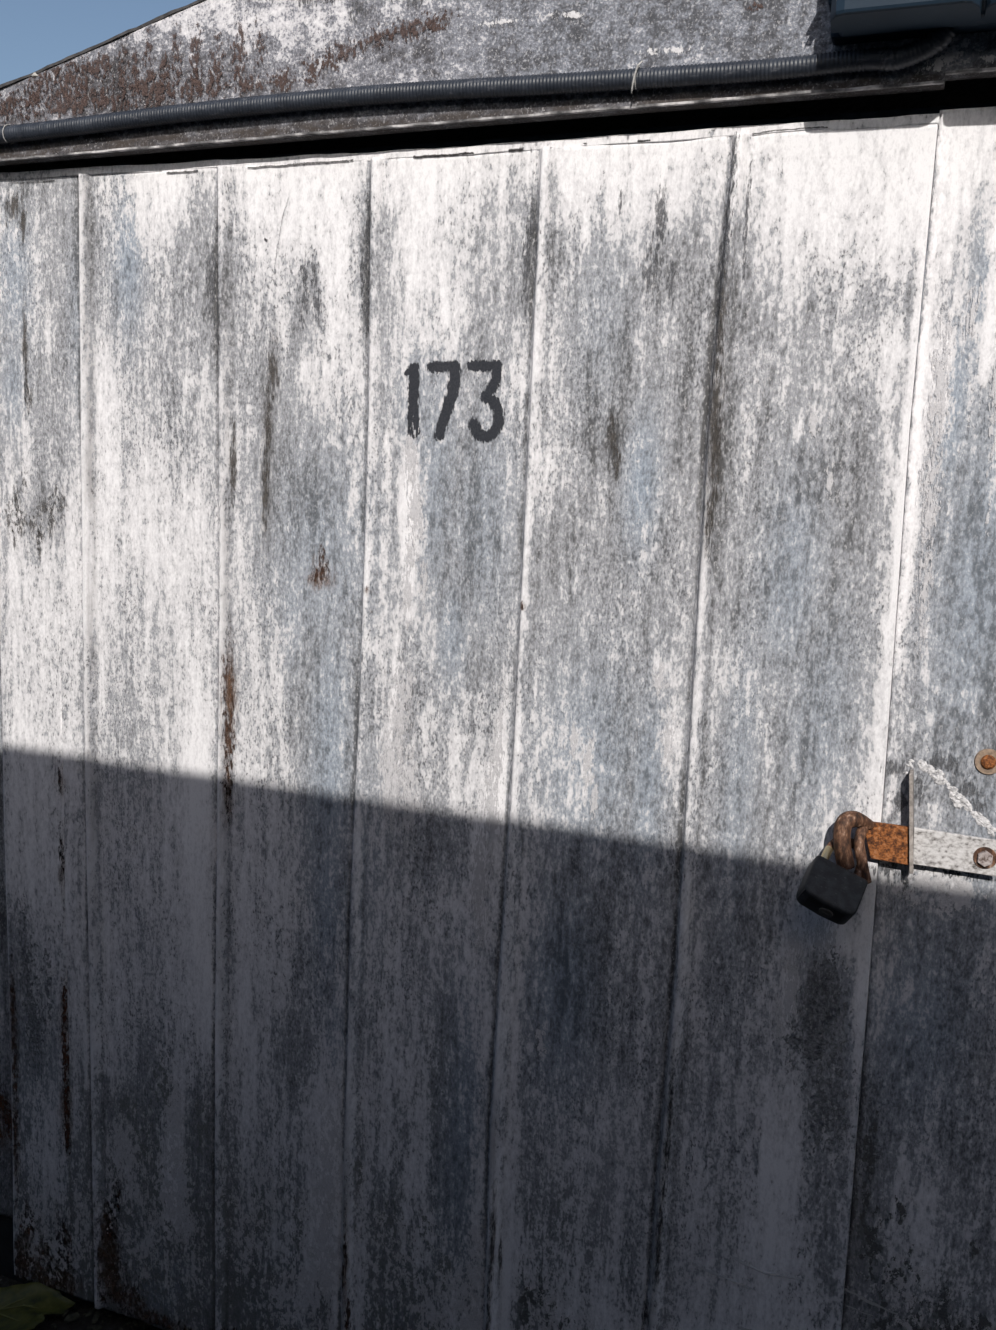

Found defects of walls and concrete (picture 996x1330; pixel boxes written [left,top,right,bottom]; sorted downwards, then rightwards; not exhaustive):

damp [640,184,678,310]
damp [715,131,752,327]
corrosion [313,544,330,583]
corrosion [220,614,236,823]
corrosion [0,955,78,1295]
corrosion [94,1168,192,1330]